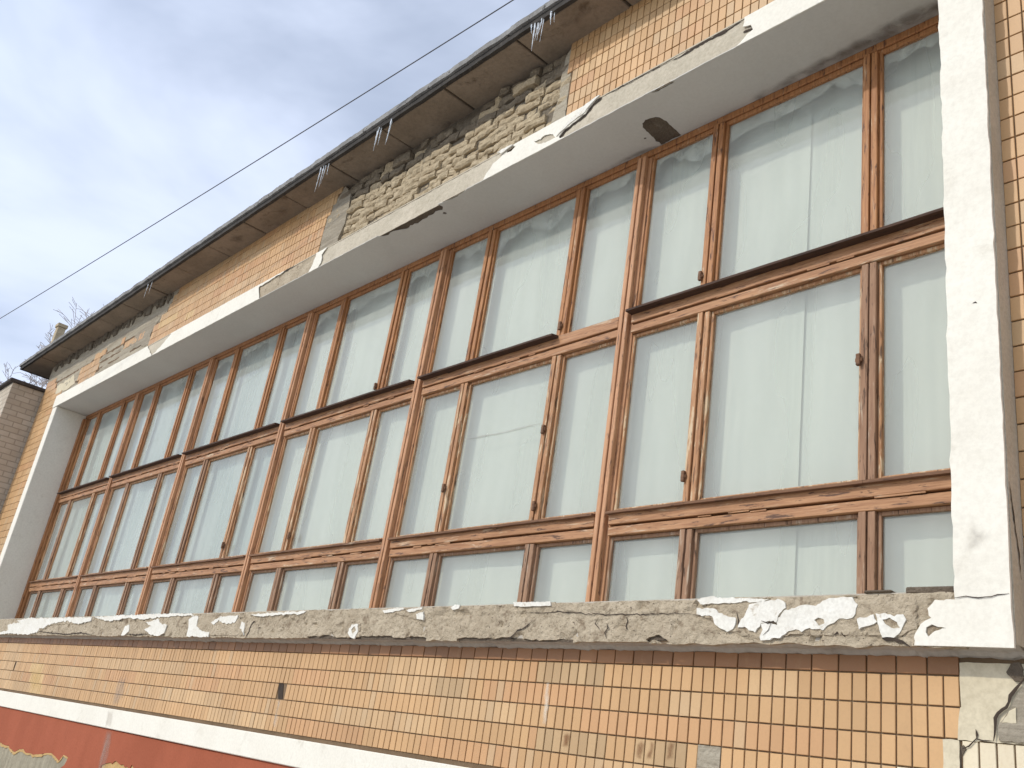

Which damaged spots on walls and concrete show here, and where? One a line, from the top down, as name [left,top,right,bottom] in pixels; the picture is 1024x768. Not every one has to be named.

peeling [260,20,753,298]
peeling [47,289,180,394]
peeling [0,611,306,637]
crack [506,611,696,639]
peeling [696,596,919,641]
peeling [943,662,1024,768]
peeling [0,742,68,768]